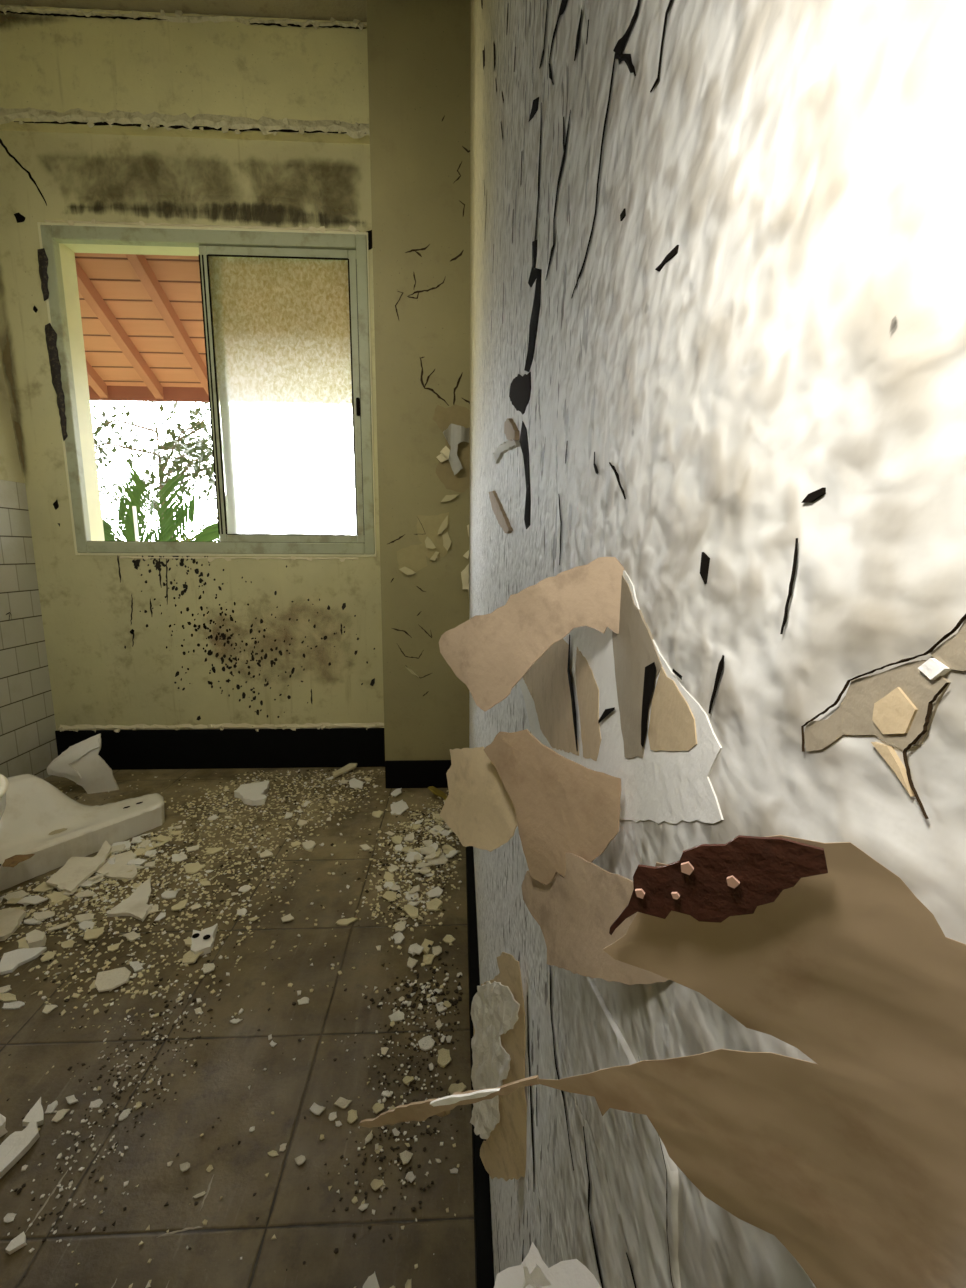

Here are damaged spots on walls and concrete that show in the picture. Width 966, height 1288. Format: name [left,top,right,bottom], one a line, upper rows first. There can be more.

peeling [0,4,367,30]
crack [0,121,366,206]
peeling [0,107,370,139]
water stain [70,156,358,226]
crack [524,0,673,372]
peeling [397,404,470,594]
peeling [489,491,513,533]
crack [519,421,562,565]
crack [565,441,626,499]
water stain [117,555,375,718]
peeling [359,557,966,1288]
crack [527,965,636,1288]